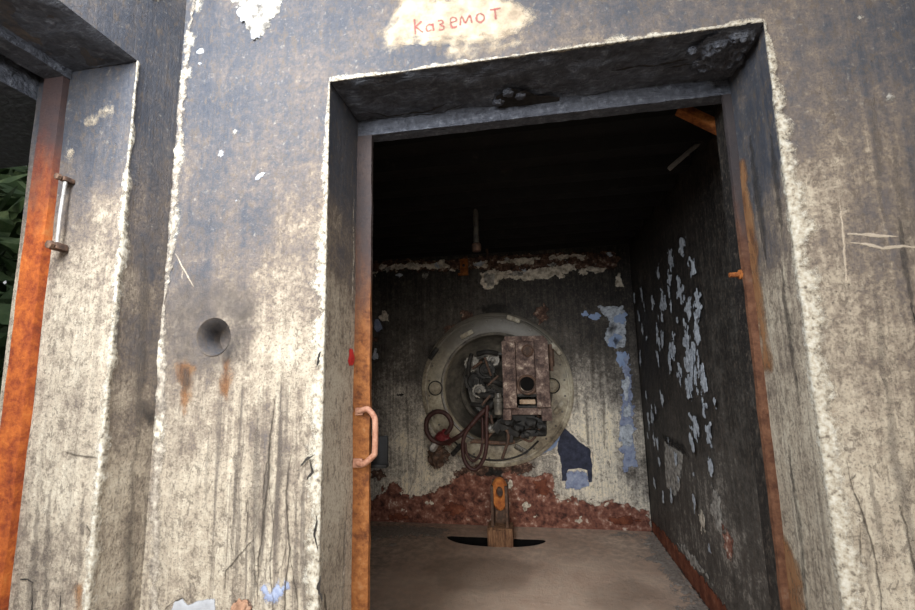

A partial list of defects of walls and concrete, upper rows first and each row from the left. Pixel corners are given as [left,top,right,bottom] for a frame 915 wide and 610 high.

flaking render [231,0,282,40]
peeling [372,250,624,290]
flaking render [148,0,215,610]
peeling [372,310,389,360]
rust [178,363,193,406]
rust [221,360,229,396]
peeling [581,237,733,561]
peeling [370,426,652,532]
peeling [677,543,713,586]
spalling [230,598,252,610]
peeling [261,581,290,603]